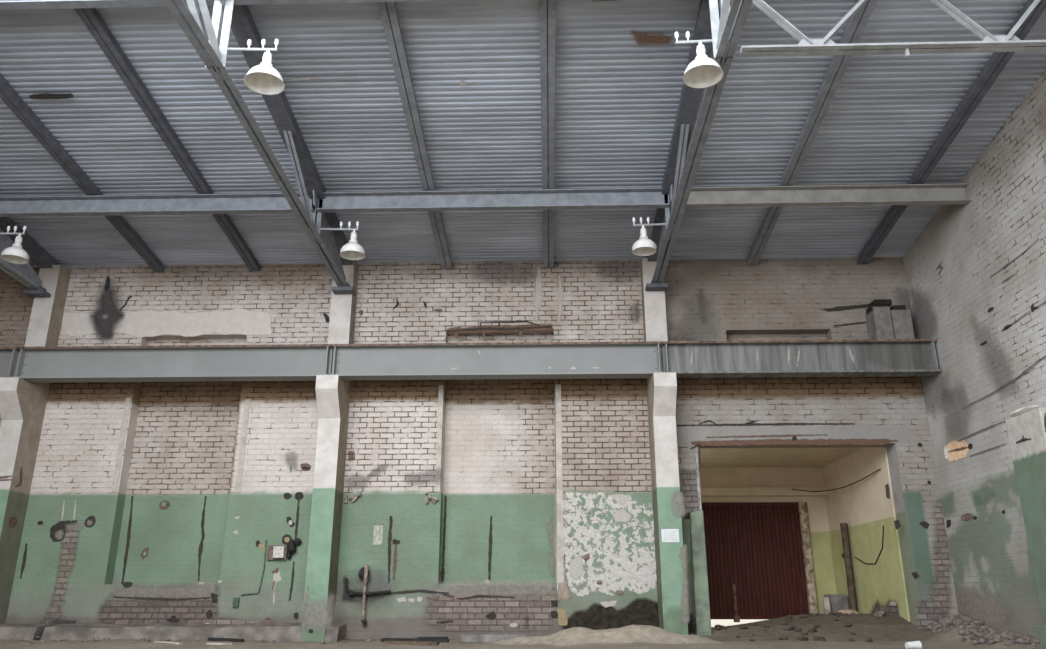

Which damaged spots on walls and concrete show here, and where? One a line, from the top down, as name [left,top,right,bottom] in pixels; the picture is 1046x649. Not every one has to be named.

corrosion [632,31,672,45]
crack [121,496,133,584]
flaking render [100,580,275,624]
crack [198,496,206,584]
peeling [272,568,281,605]
crack [440,496,448,584]
crack [484,516,492,584]
peeling [397,492,657,631]
flaking render [916,496,977,630]